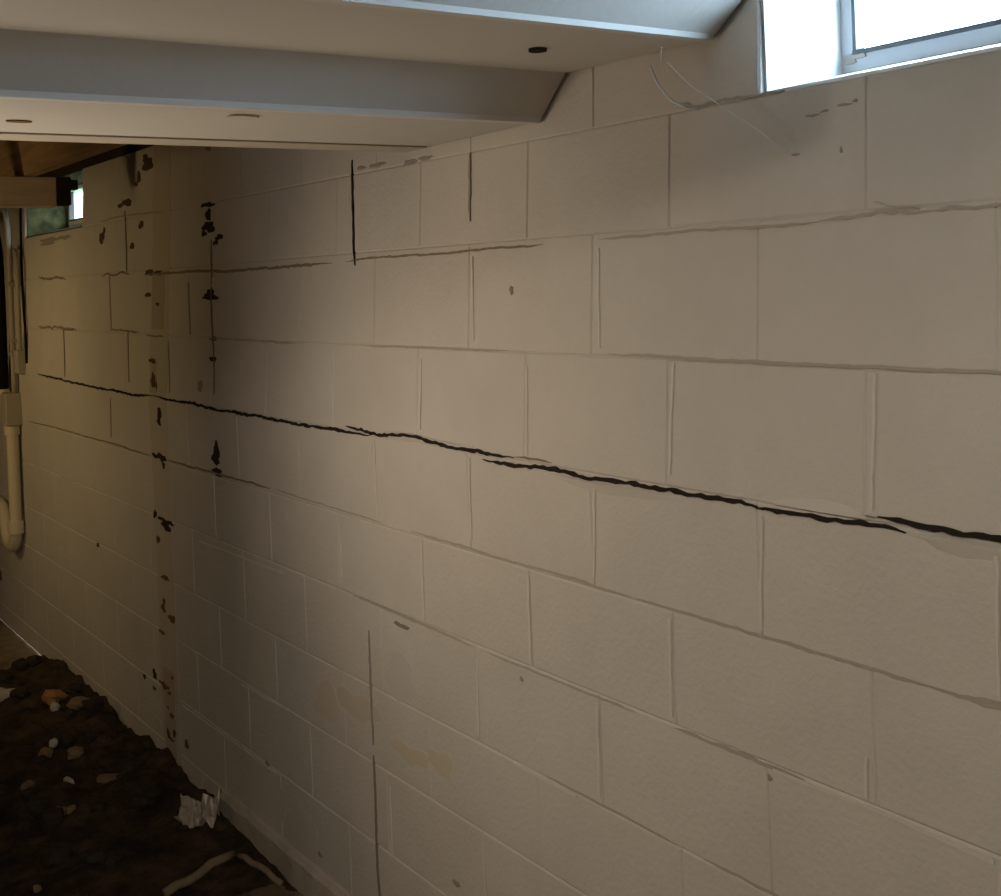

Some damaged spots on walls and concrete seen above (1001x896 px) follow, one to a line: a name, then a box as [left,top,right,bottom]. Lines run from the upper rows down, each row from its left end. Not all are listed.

crack [28,153,1001,543]